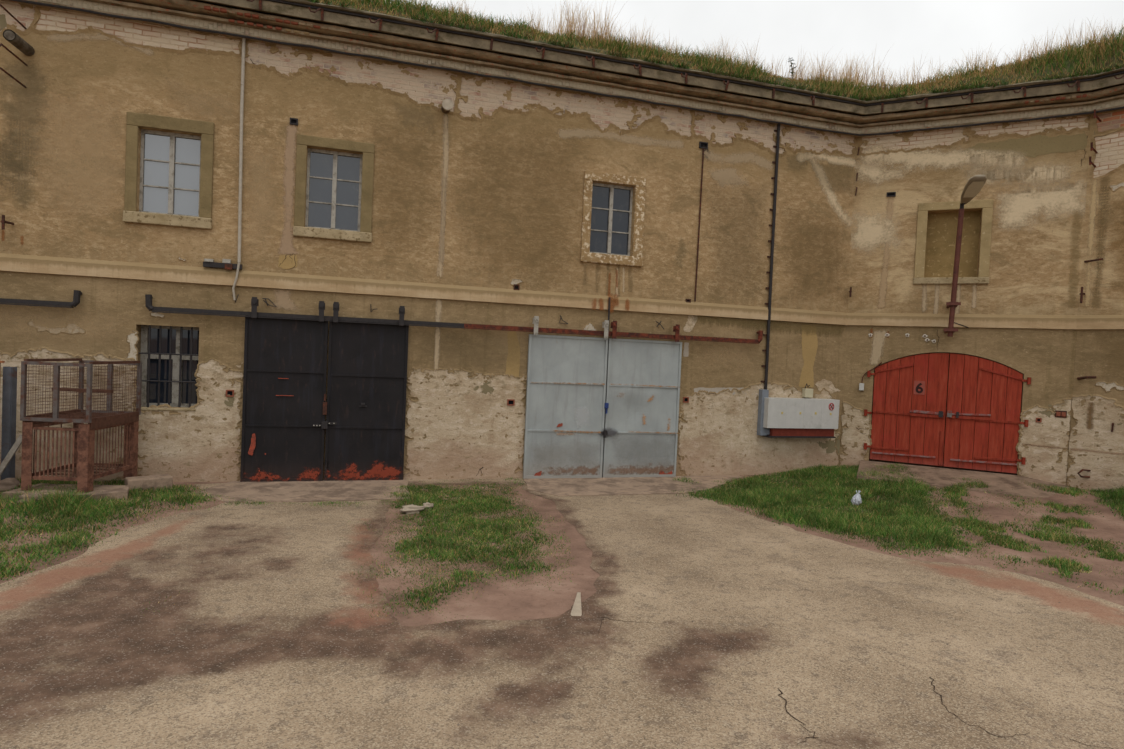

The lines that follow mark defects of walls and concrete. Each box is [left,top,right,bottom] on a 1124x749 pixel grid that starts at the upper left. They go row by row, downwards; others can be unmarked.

spalling [0,0,1124,192]
peeling [0,320,542,482]
rust [542,465,674,475]
peeling [659,379,872,476]
peeling [1016,381,1124,492]